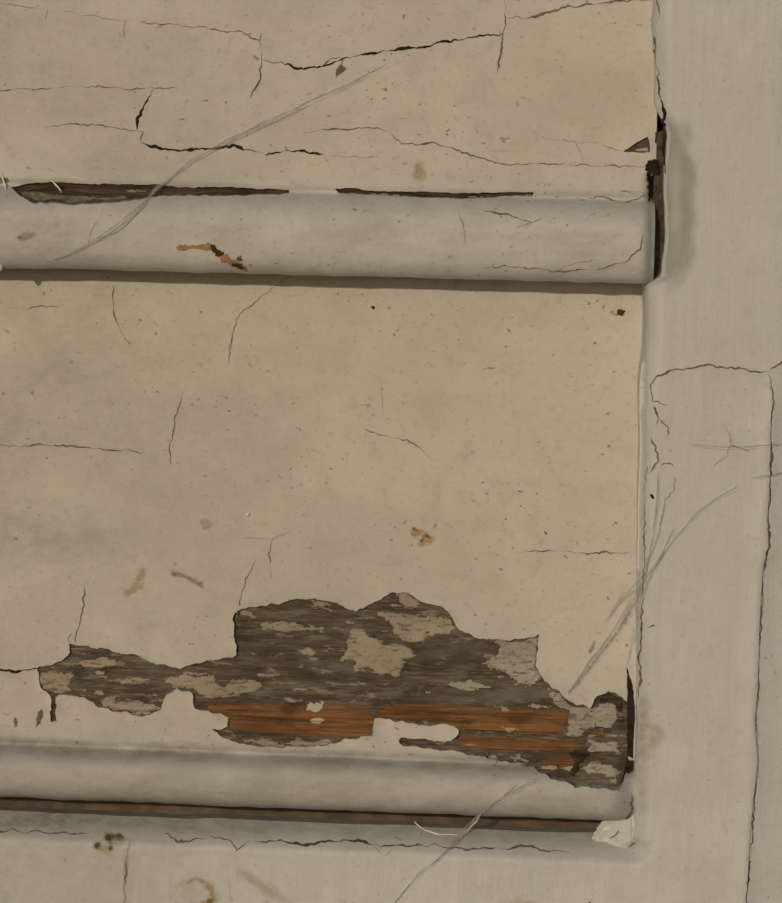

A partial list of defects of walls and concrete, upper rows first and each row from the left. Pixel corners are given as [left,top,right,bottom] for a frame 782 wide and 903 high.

crack [0,0,660,97]
crack [43,37,667,175]
crack [574,190,644,203]
peeling [176,243,247,271]
crack [0,396,182,464]
crack [513,361,782,903]
peeling [36,592,627,787]
crack [0,827,88,835]
crack [123,839,131,903]
crack [165,833,569,855]